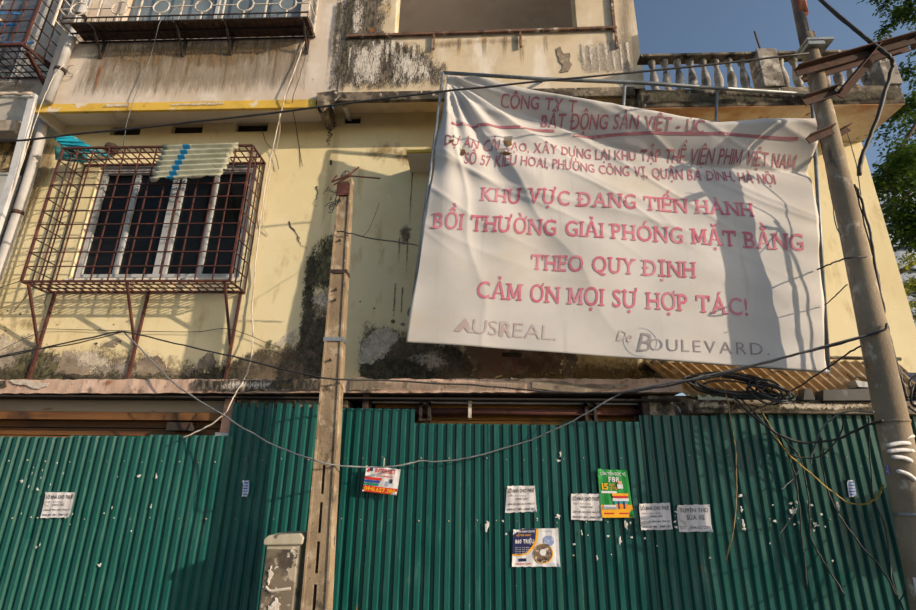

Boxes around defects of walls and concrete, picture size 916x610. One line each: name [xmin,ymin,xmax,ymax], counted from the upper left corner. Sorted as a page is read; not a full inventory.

damp [75,39,305,93]
damp [330,0,469,90]
peeling [556,46,572,73]
damp [0,233,334,391]